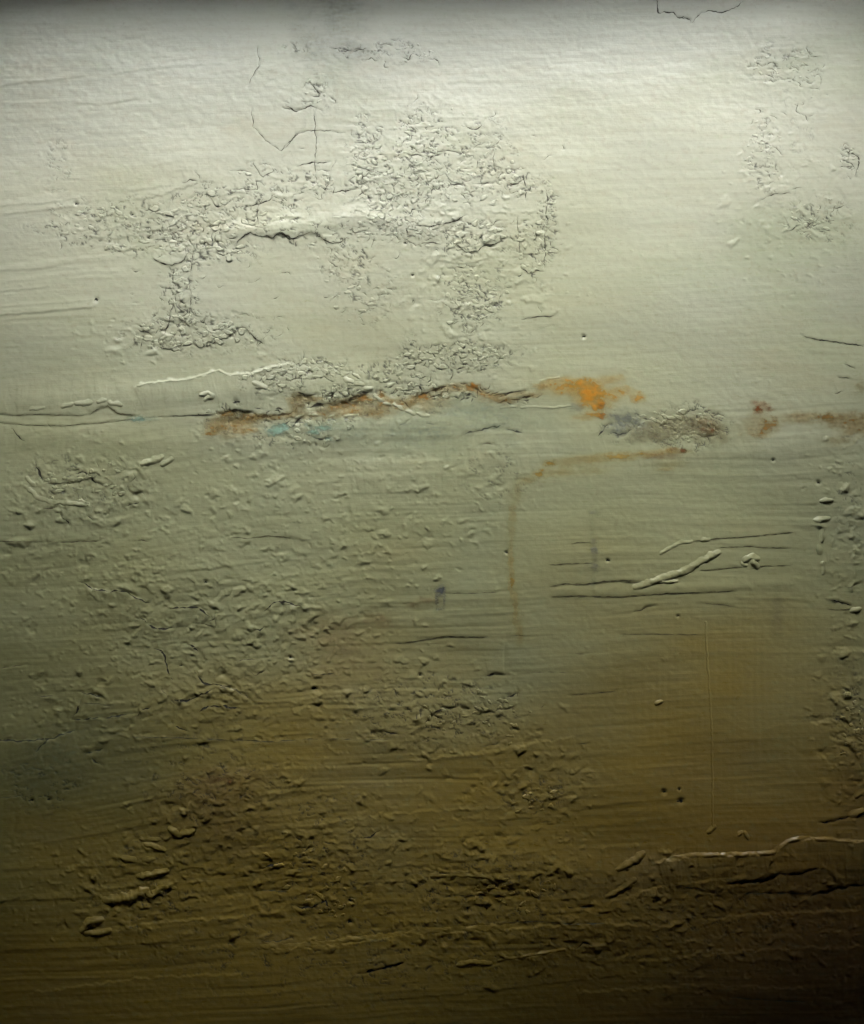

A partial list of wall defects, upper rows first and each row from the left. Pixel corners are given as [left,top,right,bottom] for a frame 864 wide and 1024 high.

crack [657,1,740,22]
crack [139,81,353,349]
peeling [60,172,289,352]
peeling [198,111,562,447]
rust [322,393,428,416]
rust [550,378,643,419]
rust [754,403,777,436]